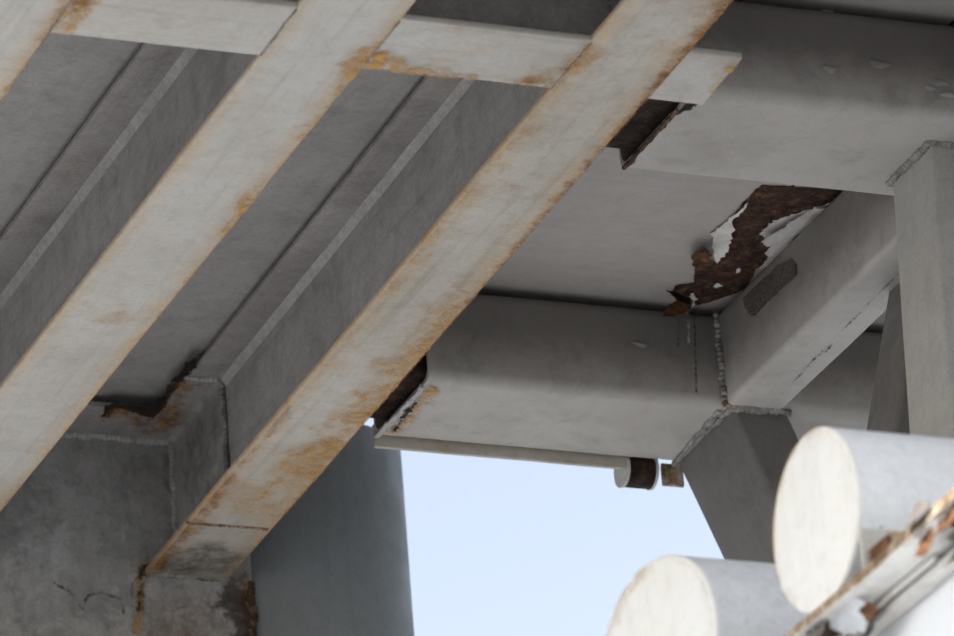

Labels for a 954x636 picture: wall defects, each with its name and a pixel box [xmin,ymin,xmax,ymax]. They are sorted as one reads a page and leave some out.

corrosion [344,49,476,80]
corrosion [670,185,842,308]
peeling [662,290,694,317]
peeling [743,259,797,316]
corrosion [343,283,487,434]
corrosion [133,462,245,634]
peeling [902,501,931,534]
peeling [913,504,954,559]
corrosion [217,575,257,636]
peeling [806,598,879,636]